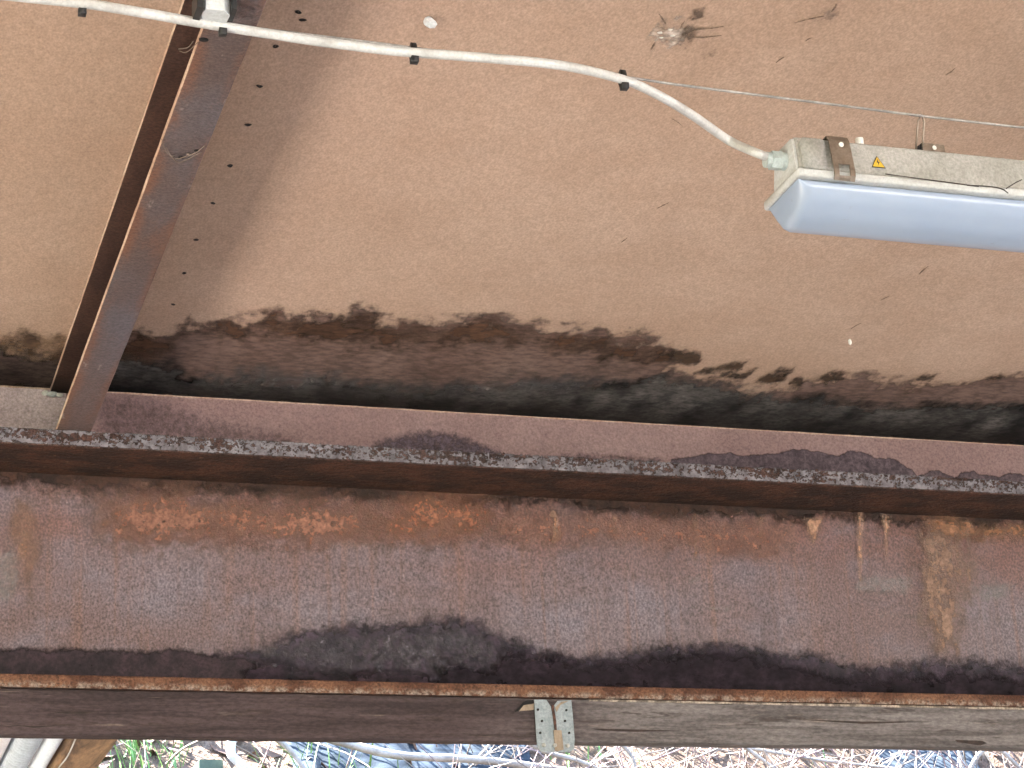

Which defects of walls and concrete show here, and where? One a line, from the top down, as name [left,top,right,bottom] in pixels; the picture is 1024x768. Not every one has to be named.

leakage [0,331,66,388]
leakage [107,304,1024,445]
corrosion [42,432,92,444]
leakage [373,430,501,454]
leakage [612,449,1024,482]
corrosion [0,471,1024,653]
leakage [0,616,1024,695]